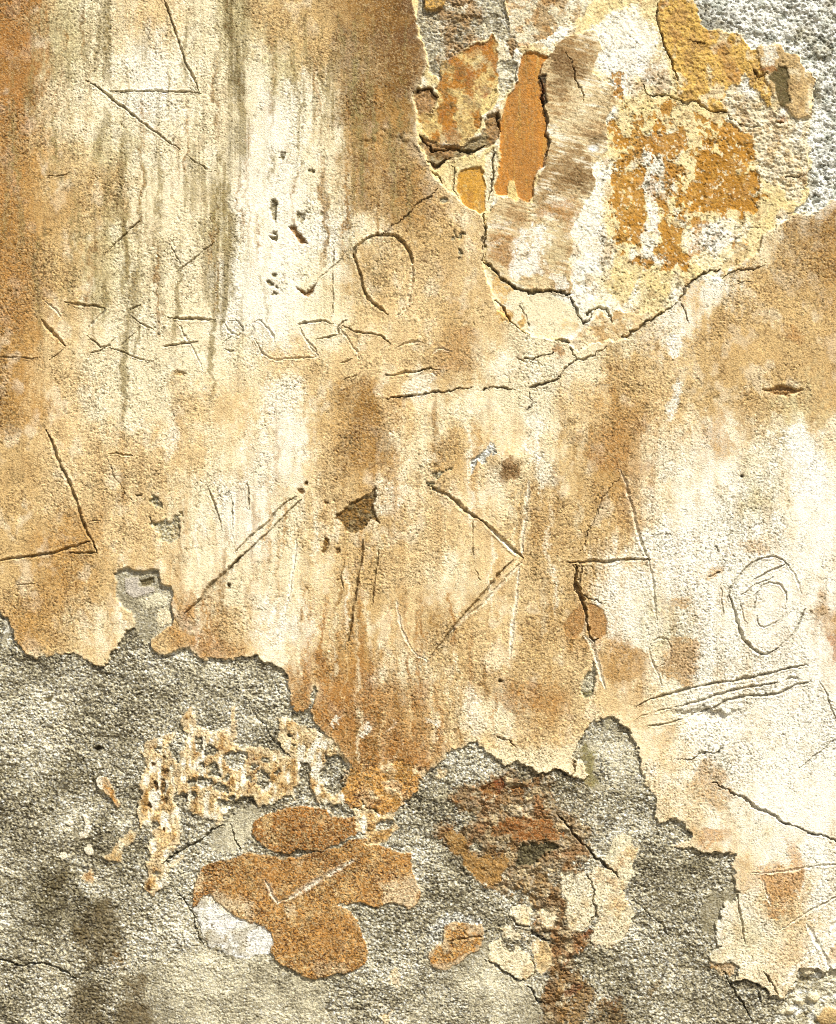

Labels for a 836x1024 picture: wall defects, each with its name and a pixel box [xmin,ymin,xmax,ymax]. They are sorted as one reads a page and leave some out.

leakage [102,0,113,83]
crack [413,88,439,98]
leakage [92,108,113,166]
leakage [113,138,148,240]
leakage [198,0,250,320]
spalling [412,0,836,352]
leakage [132,224,168,306]
crack [383,112,766,412]
spalling [335,487,380,534]
spalling [0,568,836,1024]
crack [711,781,836,843]